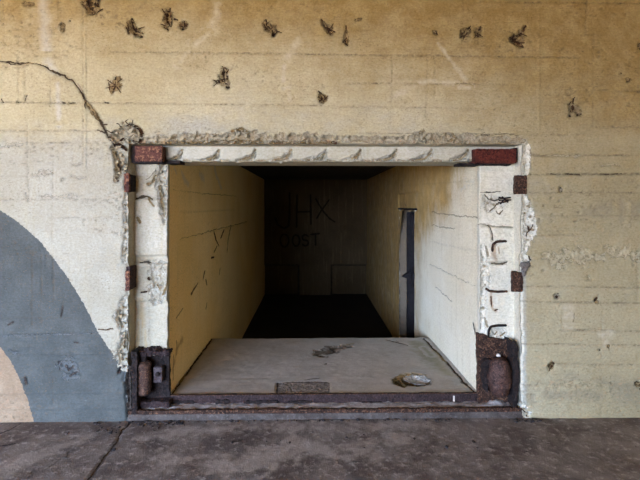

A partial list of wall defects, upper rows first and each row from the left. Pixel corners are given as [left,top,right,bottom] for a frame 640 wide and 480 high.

crack [0,61,112,142]
spalling [106,119,531,225]
spalling [120,195,129,264]
spalling [519,195,538,277]
spalling [473,244,508,339]